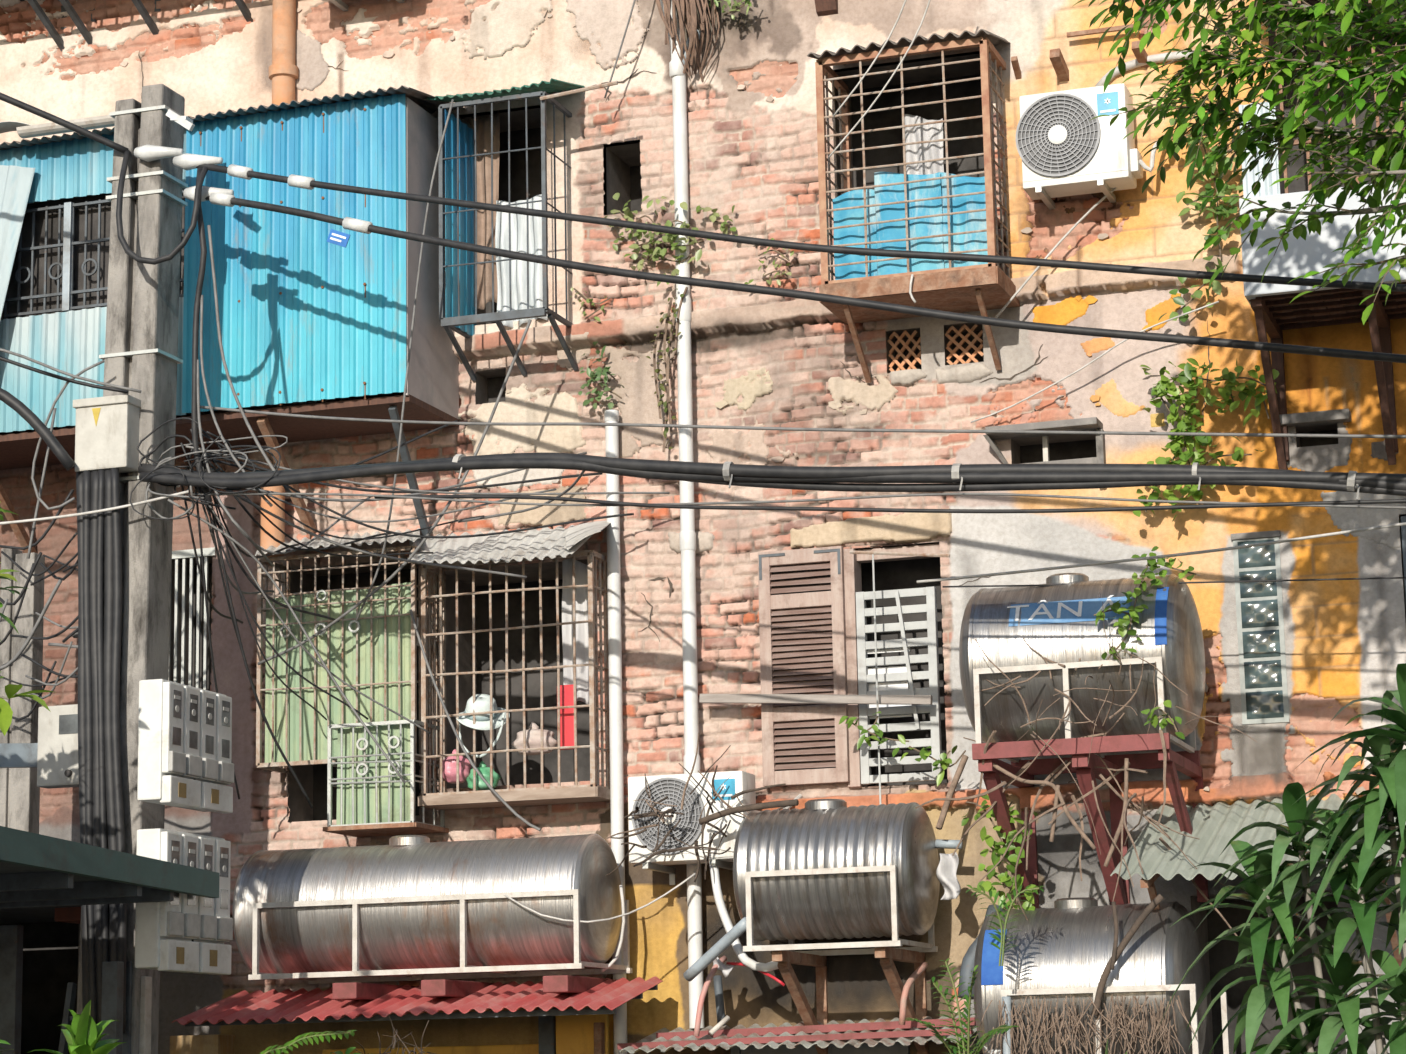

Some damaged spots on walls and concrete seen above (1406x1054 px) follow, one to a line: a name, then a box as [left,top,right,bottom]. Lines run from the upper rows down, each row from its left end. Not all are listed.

spalling [0,0,262,81]
spalling [295,0,650,91]
spalling [729,60,798,103]
spalling [1021,190,1134,260]
spalling [988,376,1101,426]
spalling [1199,633,1234,791]
spalling [1284,693,1365,798]